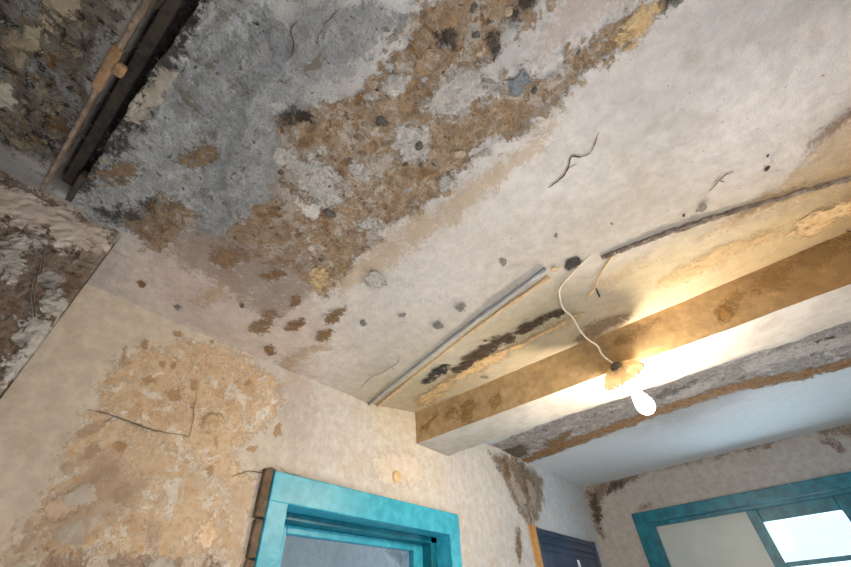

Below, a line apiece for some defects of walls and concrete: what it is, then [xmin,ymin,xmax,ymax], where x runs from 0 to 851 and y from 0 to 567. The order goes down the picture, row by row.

spalling [0,0,684,399]
damp [655,196,851,288]
damp [419,399,477,432]
damp [416,312,583,407]
damp [574,314,629,343]
spalling [491,321,851,463]
spalling [4,468,120,567]
spalling [108,522,222,567]